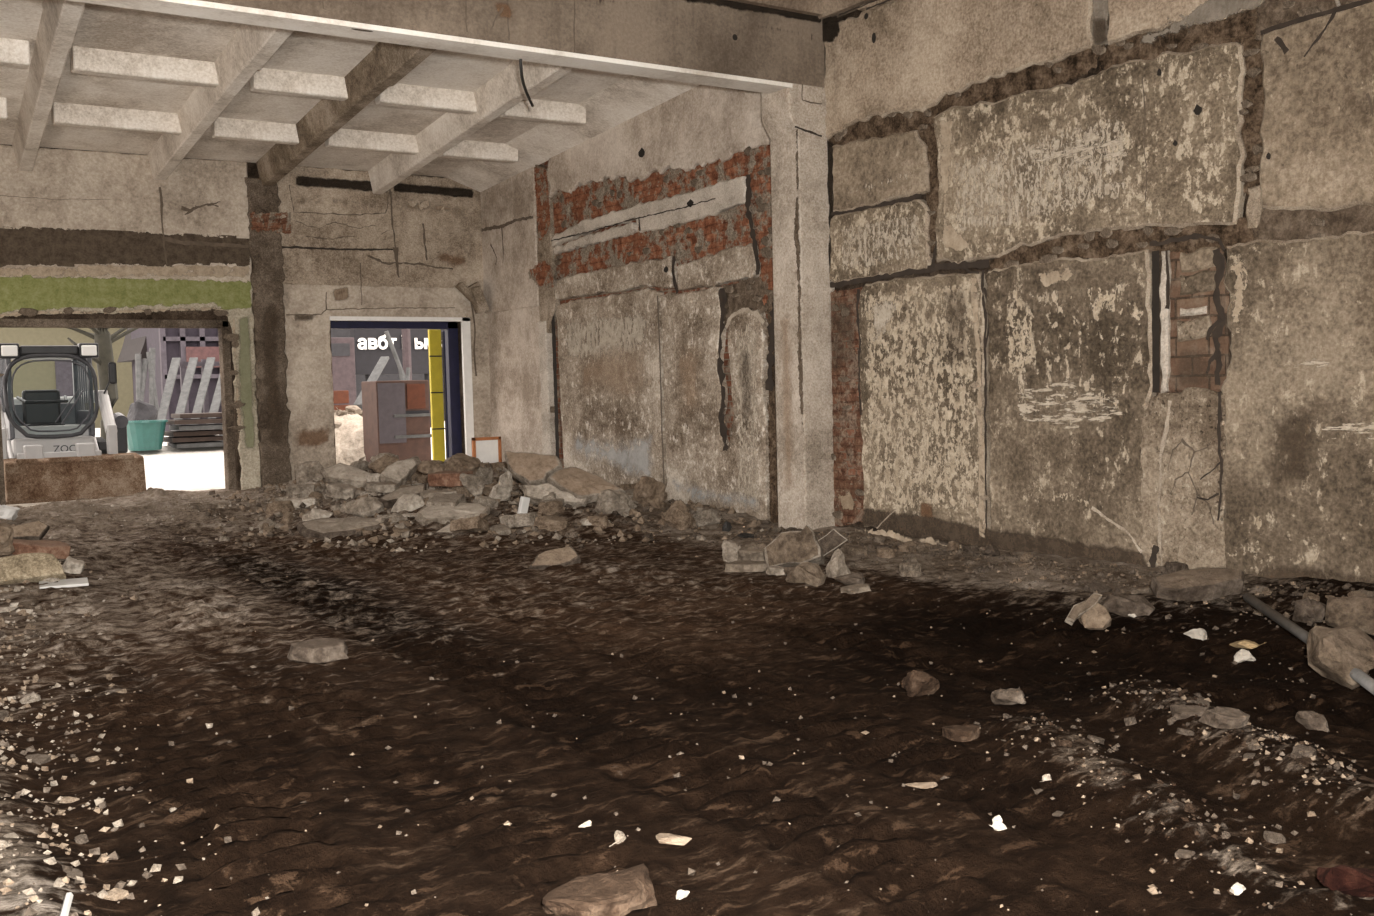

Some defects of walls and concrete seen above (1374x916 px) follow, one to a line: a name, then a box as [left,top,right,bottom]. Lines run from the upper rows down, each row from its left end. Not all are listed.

peeling [0,211,291,448]
flaking render [528,145,774,508]
spalling [827,0,1374,538]
crack [1140,77,1148,207]
crack [1091,233,1226,568]